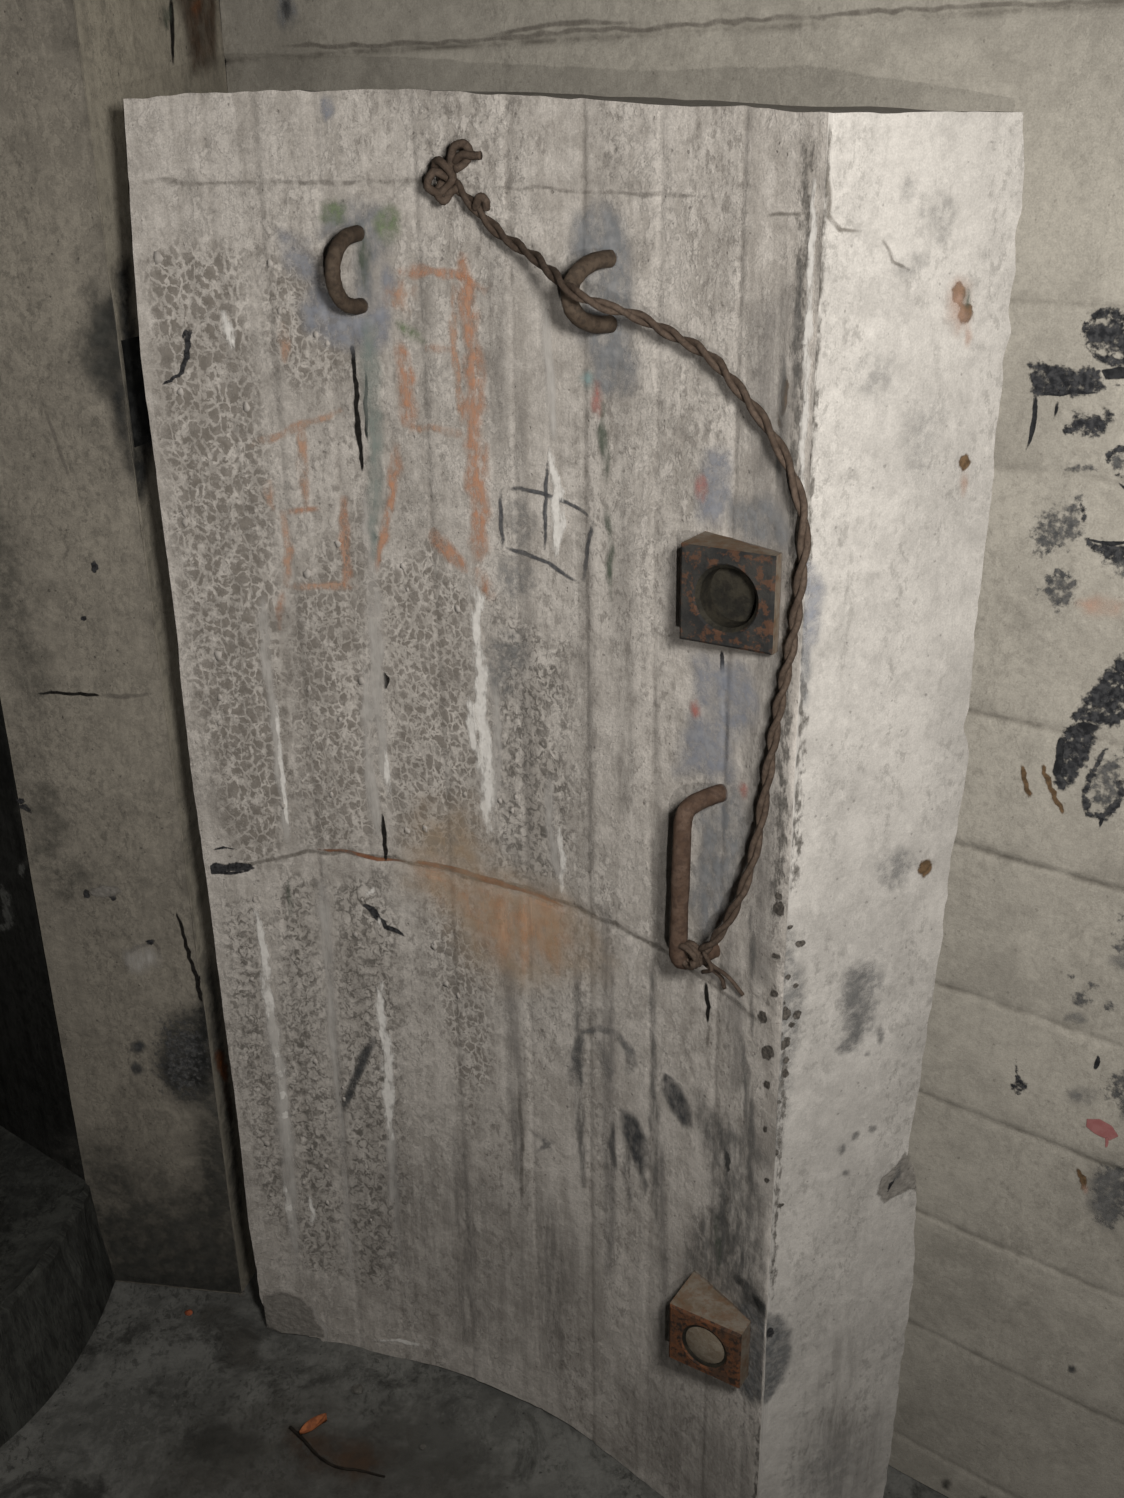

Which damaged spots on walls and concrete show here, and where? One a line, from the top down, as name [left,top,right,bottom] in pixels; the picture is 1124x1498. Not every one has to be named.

crack [383,673,391,689]
crack [245,815,745,1040]
water stain [92,968,242,1292]
spalling [878,1154,917,1202]